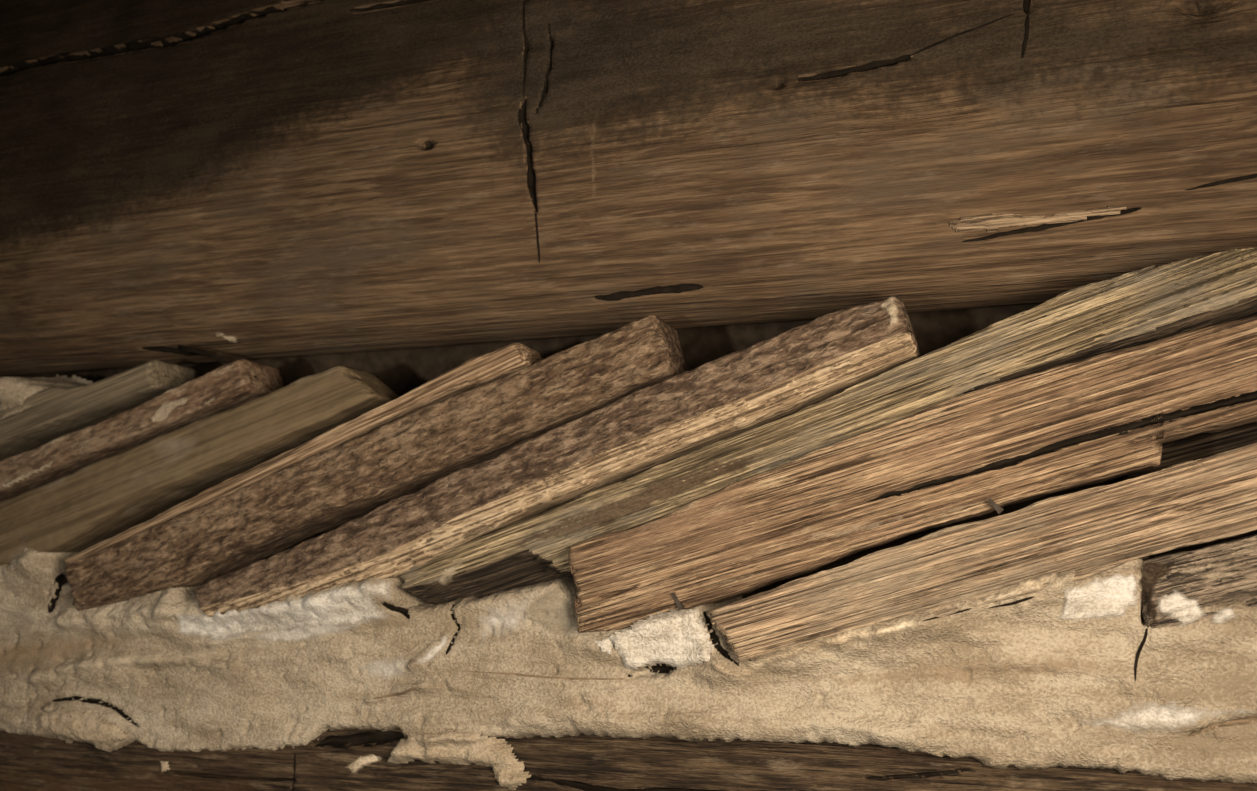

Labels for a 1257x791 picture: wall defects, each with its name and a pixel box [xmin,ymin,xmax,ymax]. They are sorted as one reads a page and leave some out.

crack [349,0,432,11]
crack [0,0,309,77]
crack [798,0,1031,81]
crack [518,0,553,263]
crack [1186,174,1257,190]
crack [1134,628,1148,681]
crack [40,696,139,727]